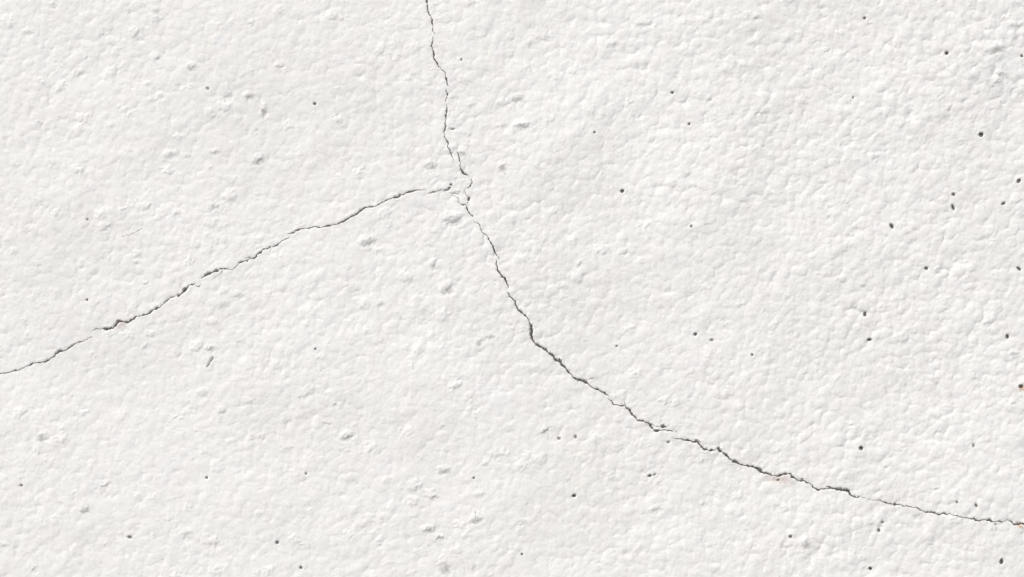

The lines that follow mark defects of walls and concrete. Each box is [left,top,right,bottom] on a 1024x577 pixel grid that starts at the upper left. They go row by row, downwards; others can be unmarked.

crack [0,189,420,374]
crack [426,0,1024,525]